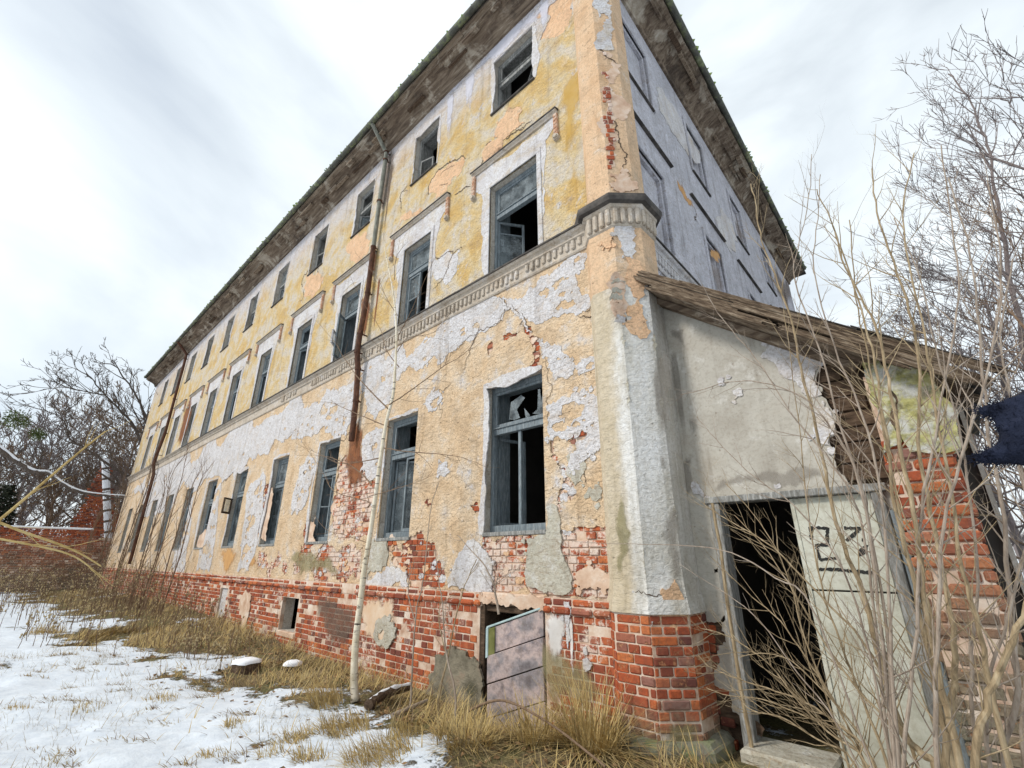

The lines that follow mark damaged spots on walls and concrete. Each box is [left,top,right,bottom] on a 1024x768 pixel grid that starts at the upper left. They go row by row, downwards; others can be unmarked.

flaking render [494,106,524,140]
spalling [592,0,639,193]
crack [614,121,631,176]
flaking render [598,226,651,347]
rust [345,422,362,503]
peeling [134,249,609,601]
flaking render [761,342,838,455]